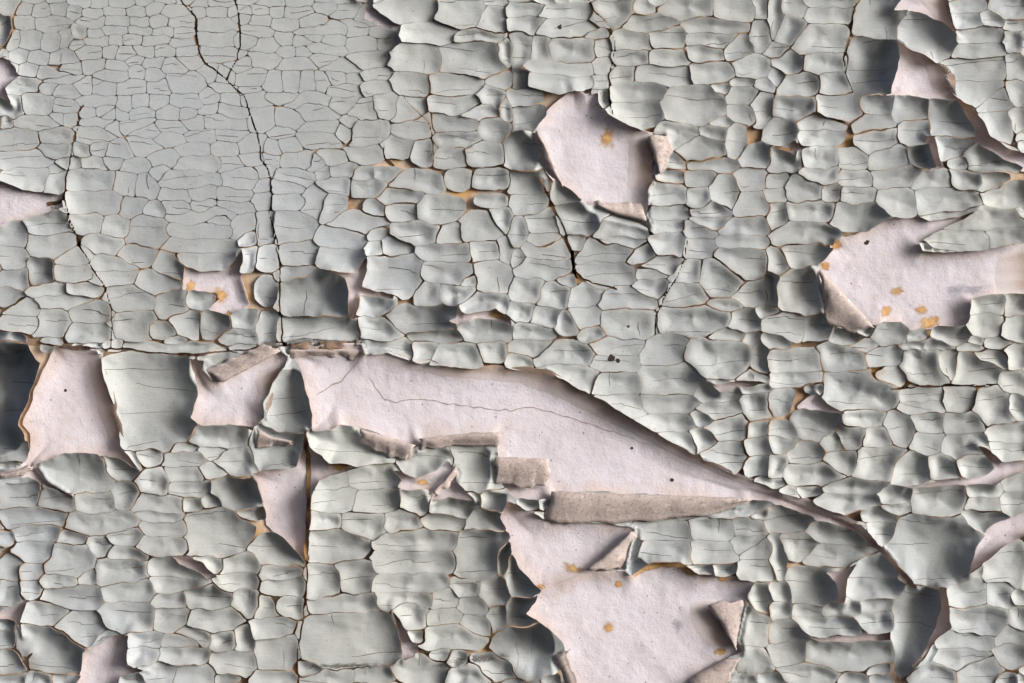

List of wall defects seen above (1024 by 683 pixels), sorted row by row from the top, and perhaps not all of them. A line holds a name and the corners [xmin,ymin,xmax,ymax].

peeling [502,0,667,171]
crack [843,4,857,74]
peeling [0,0,513,683]
crack [0,0,653,446]
peeling [101,141,1024,683]
crack [654,241,688,334]
peeling [533,0,1024,426]
crack [891,382,997,390]
crack [294,429,311,683]